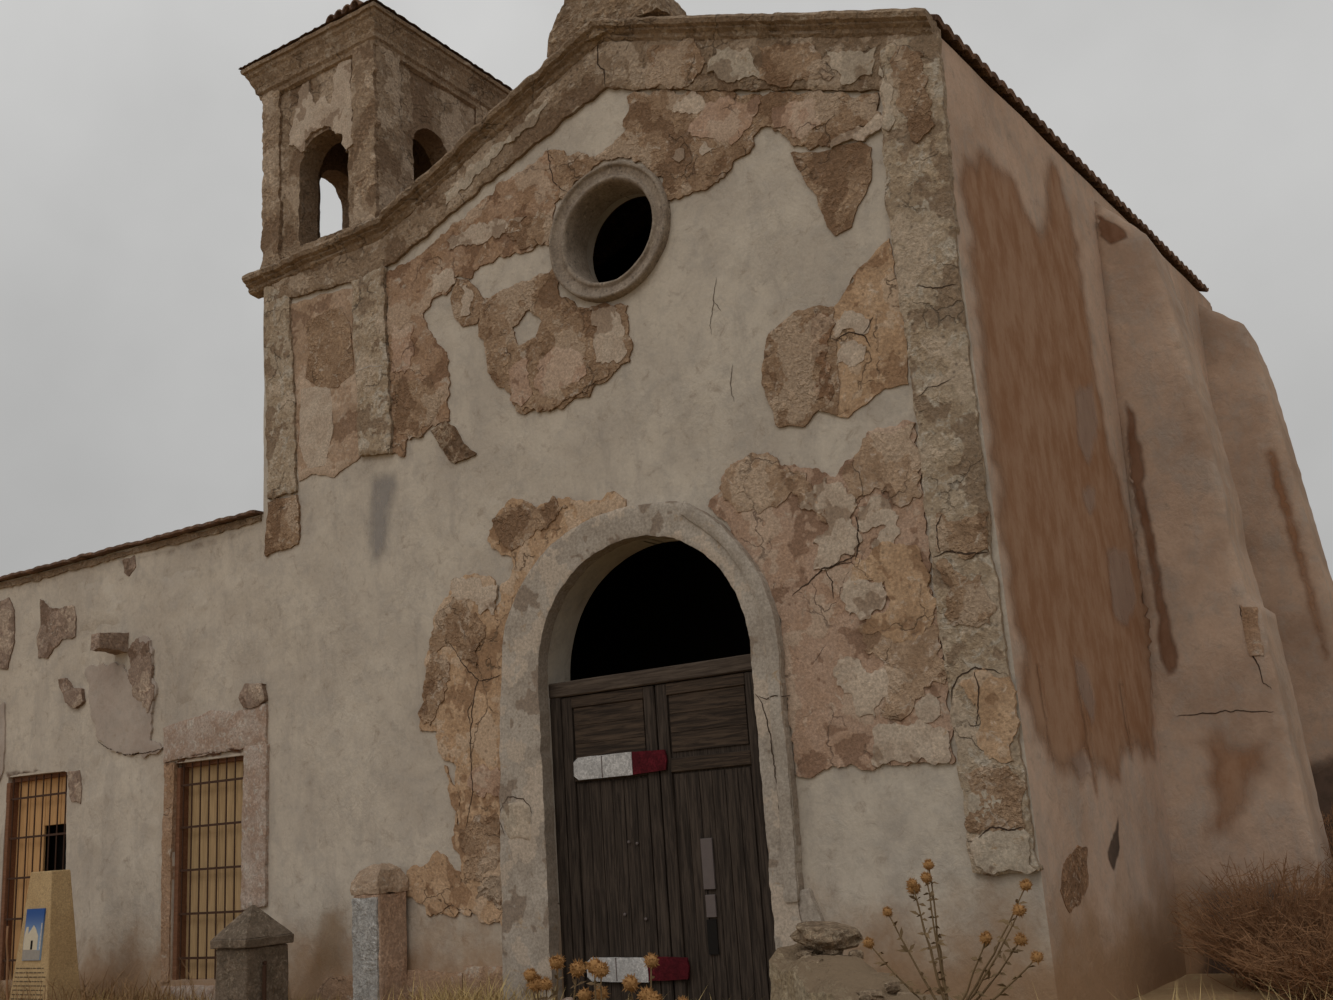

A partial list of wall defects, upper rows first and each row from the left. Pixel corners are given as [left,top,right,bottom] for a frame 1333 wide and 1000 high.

peeling [58,635,163,758]
peeling [299,307,355,468]
peeling [406,491,627,926]
peeling [386,38,935,464]
peeling [708,420,1038,874]
damp [962,154,1155,791]
crack [1179,656,1274,716]